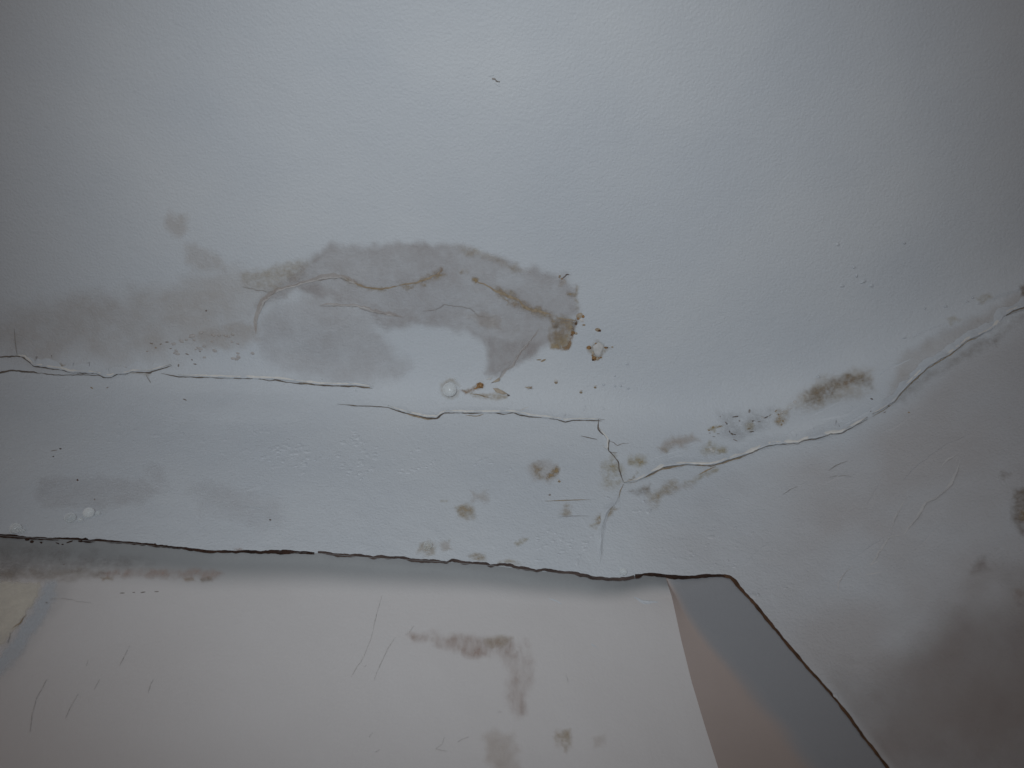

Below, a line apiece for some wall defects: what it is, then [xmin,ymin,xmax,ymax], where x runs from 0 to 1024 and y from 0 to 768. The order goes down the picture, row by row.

crack [0,281,1024,483]